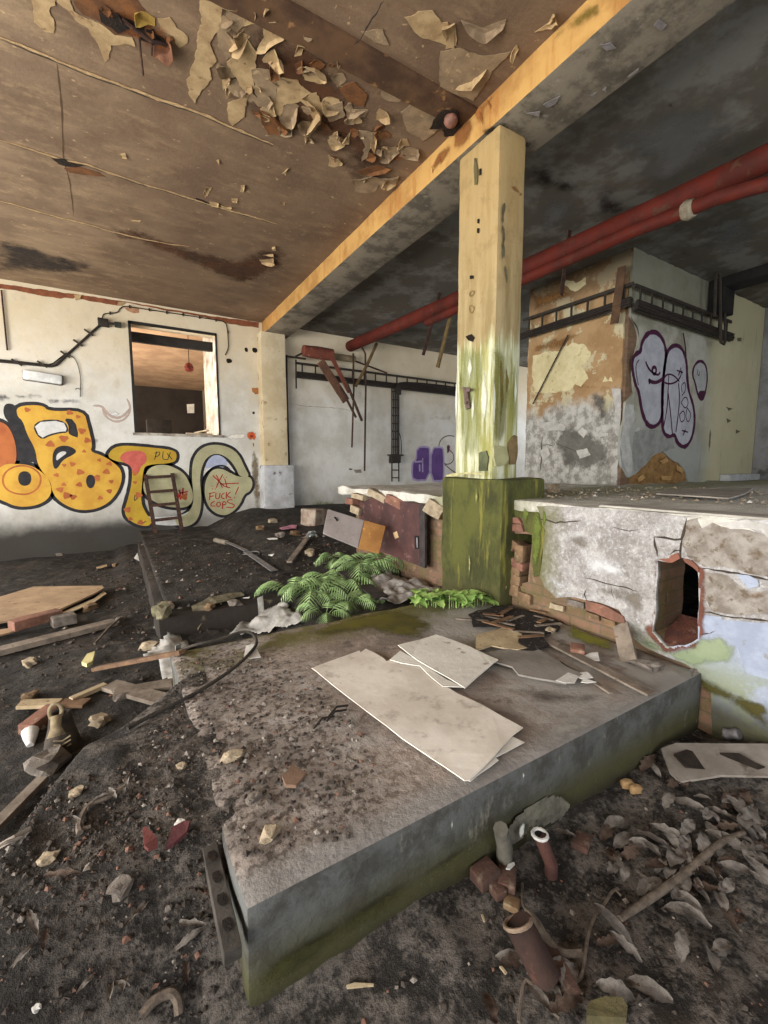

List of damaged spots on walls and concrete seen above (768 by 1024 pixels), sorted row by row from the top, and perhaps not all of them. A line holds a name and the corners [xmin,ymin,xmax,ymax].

peeling [535,14,558,32]
peeling [404,10,519,101]
peeling [32,0,461,193]
crack [0,37,279,247]
damp [2,244,87,271]
damp [119,231,278,281]
peeling [565,277,586,292]
damp [468,360,517,420]
peeling [532,343,591,393]
damp [523,509,546,563]
crack [611,519,768,580]
crack [584,578,638,601]